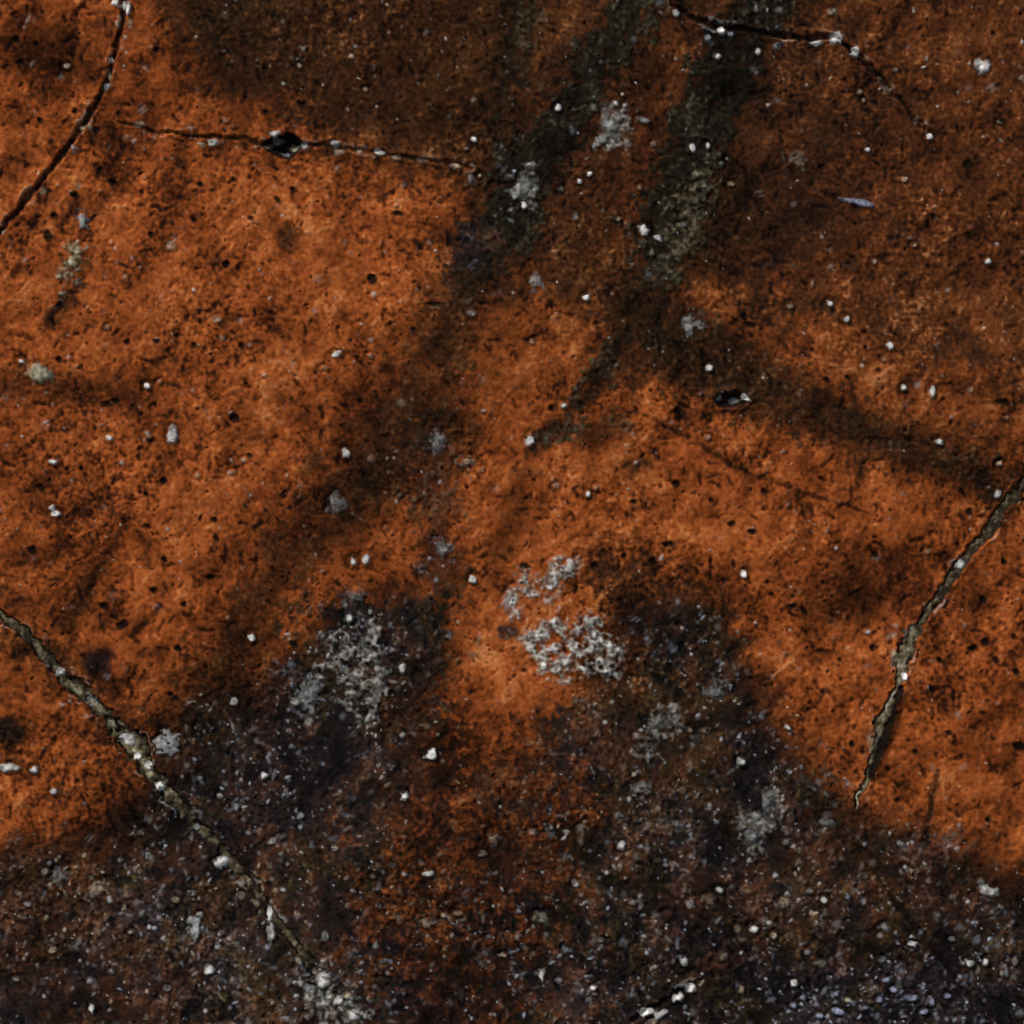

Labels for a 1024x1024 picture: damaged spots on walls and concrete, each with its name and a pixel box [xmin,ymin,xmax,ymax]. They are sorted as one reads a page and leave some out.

crack [0,0,132,276]
crack [182,131,281,147]
crack [305,140,467,167]
crack [130,605,162,637]
crack [855,477,1024,809]
crack [0,610,360,1024]
crack [924,770,939,842]